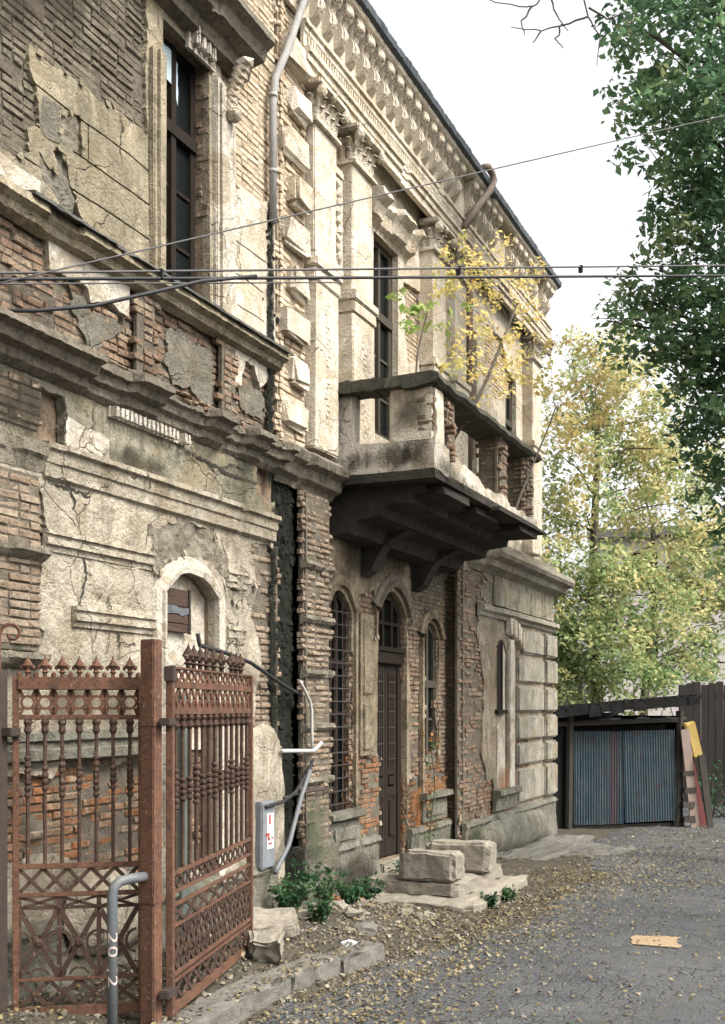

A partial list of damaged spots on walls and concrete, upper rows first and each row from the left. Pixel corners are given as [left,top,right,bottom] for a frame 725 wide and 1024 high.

flaking render [0,0,145,219]
flaking render [0,215,134,369]
leakage [267,207,275,340]
flaking render [155,308,218,408]
flaking render [236,365,274,431]
leakage [267,368,275,435]
crack [49,479,91,510]
crack [179,444,262,485]
crack [79,558,136,657]
leakage [268,471,294,840]
leakage [284,853,292,889]